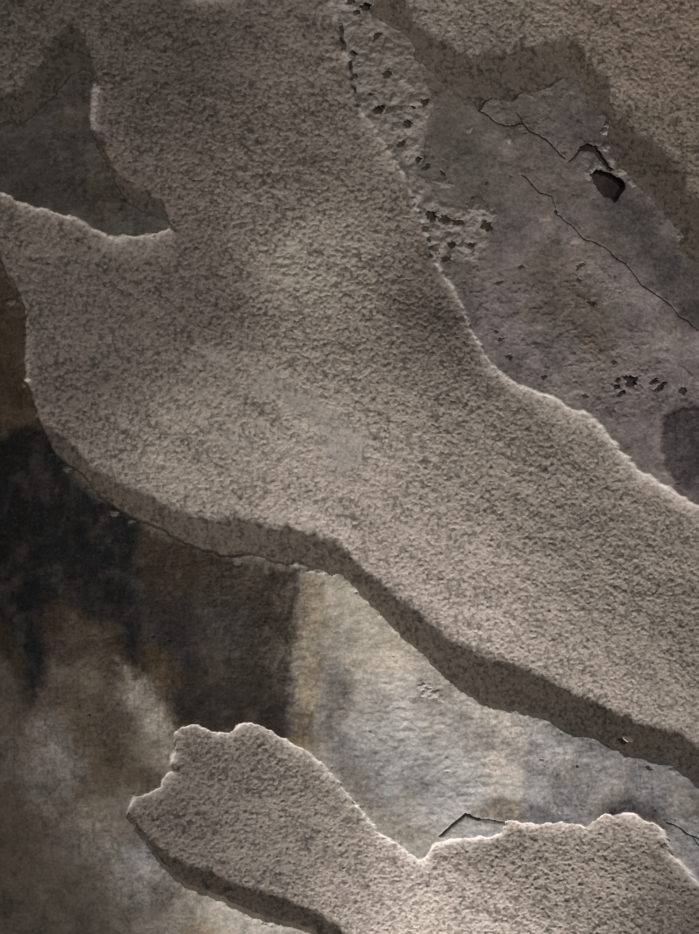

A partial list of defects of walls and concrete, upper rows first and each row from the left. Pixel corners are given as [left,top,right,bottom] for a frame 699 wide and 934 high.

spalling [0,67,171,241]
crack [480,111,580,162]
spalling [328,0,699,507]
crack [521,174,698,330]
spalling [0,257,691,781]
spalling [126,722,699,934]
crack [667,822,699,846]